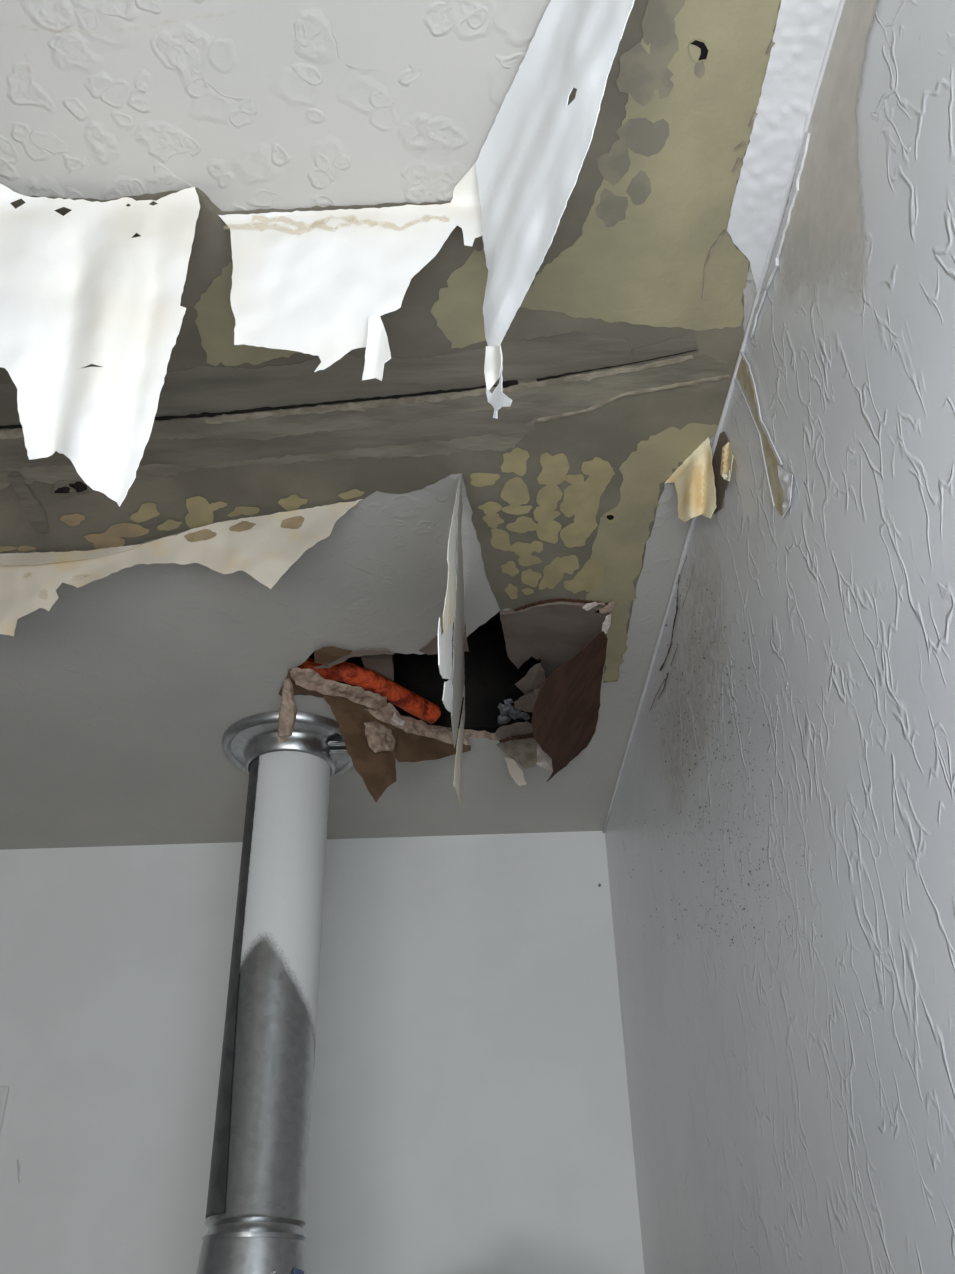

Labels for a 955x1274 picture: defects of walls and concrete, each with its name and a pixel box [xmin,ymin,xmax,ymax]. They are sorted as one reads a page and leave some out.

peeling [0,0,793,733]
damp [658,573,822,947]